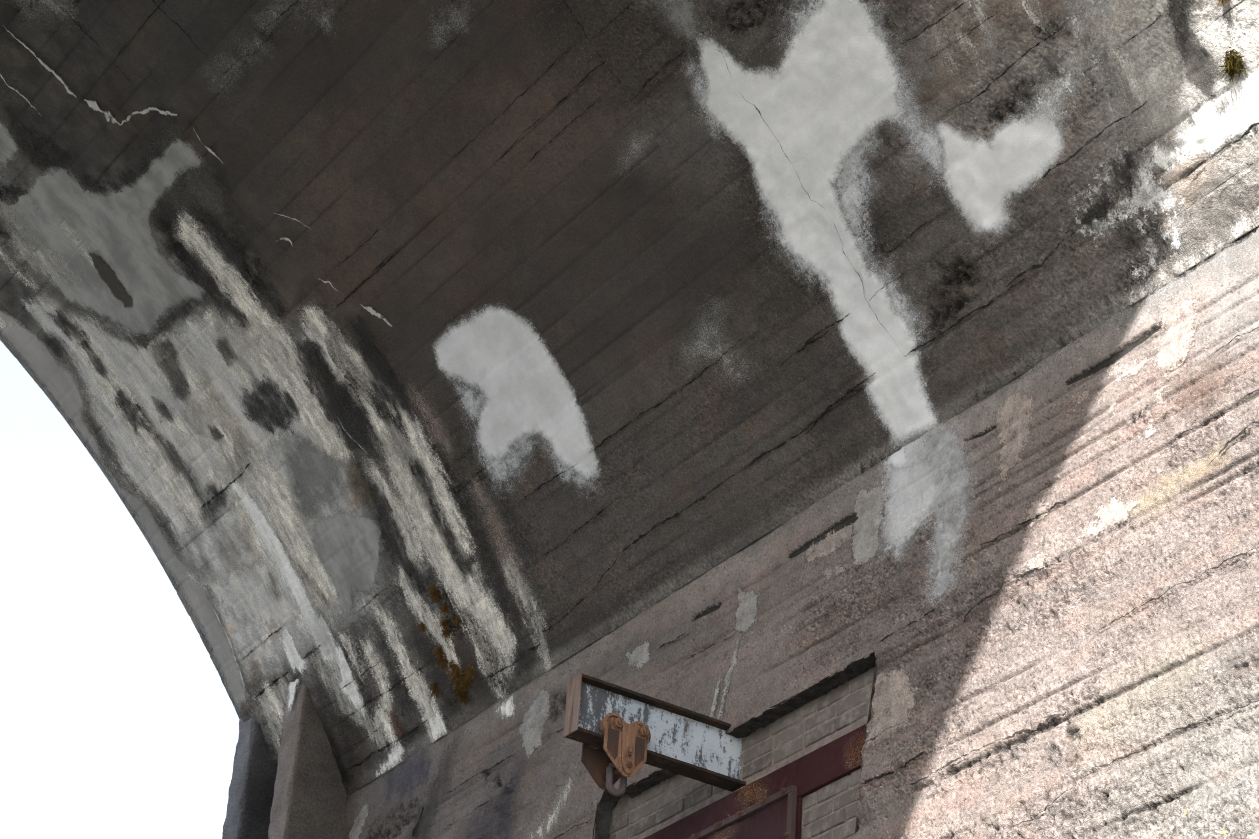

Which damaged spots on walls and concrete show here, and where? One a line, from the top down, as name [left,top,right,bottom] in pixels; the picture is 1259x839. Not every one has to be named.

crack [2,0,224,164]
leakage [925,0,998,79]
leakage [1022,0,1044,29]
leakage [1068,64,1259,321]
leakage [101,212,553,839]